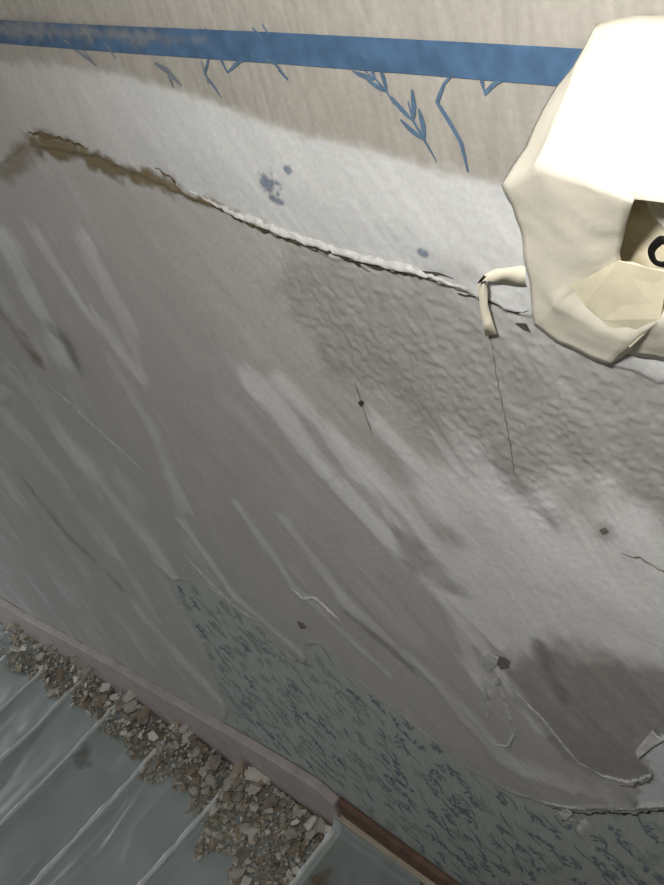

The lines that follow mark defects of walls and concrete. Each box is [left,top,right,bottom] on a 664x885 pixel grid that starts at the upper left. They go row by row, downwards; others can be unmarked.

crack [189,190,531,333]
crack [355,383,373,436]
crack [490,337,514,470]
crack [622,553,664,572]
spalling [480,653,510,685]
flaking render [635,730,664,758]
flaking render [590,770,654,788]
flaking render [541,801,664,821]